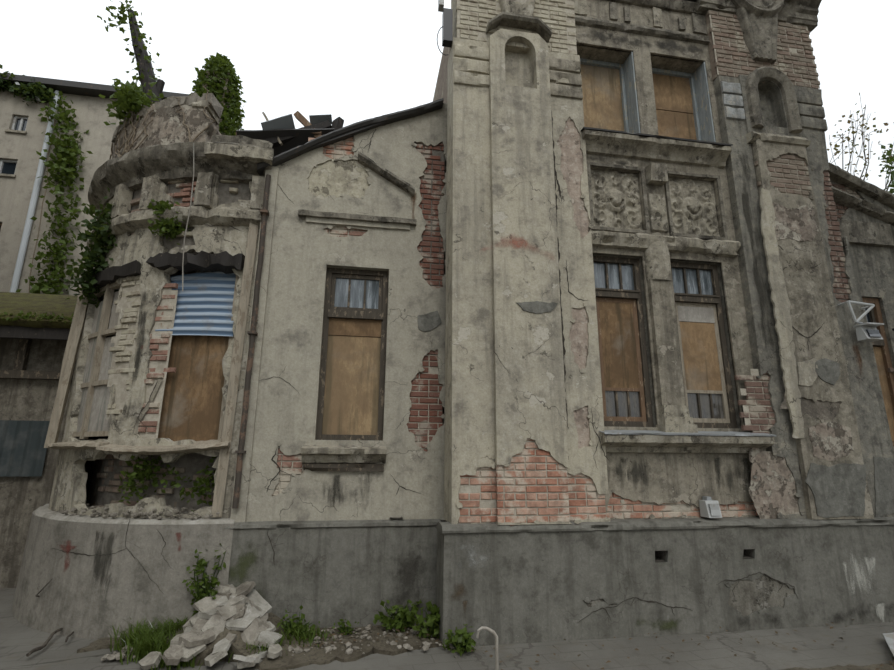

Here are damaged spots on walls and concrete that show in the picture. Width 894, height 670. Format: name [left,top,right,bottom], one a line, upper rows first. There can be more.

peeling [308,137,370,199]
spalling [412,142,446,289]
spalling [754,154,861,303]
crack [532,110,588,427]
crack [267,447,294,491]
spalling [406,350,445,452]
spalling [456,438,707,526]
crack [591,408,608,463]
spalling [719,448,801,519]
spalling [734,369,788,434]
crack [53,520,164,594]
crack [575,592,693,623]